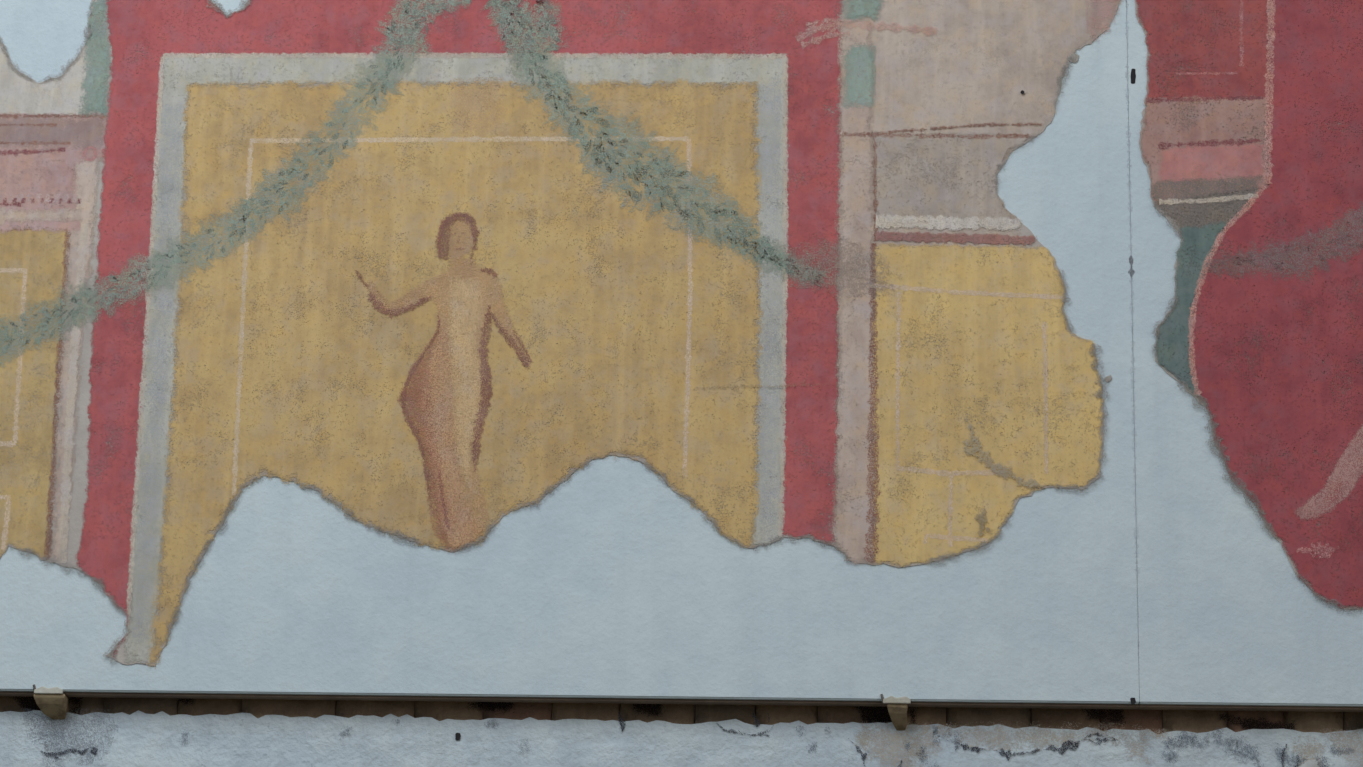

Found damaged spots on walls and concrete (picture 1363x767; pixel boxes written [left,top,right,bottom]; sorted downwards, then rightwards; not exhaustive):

flaking render [206,0,251,18]
flaking render [0,0,92,83]
flaking render [0,696,41,712]
flaking render [68,697,892,725]
flaking render [907,707,1363,734]
crack [848,738,902,767]
crack [955,733,1117,761]
crack [1280,744,1300,767]